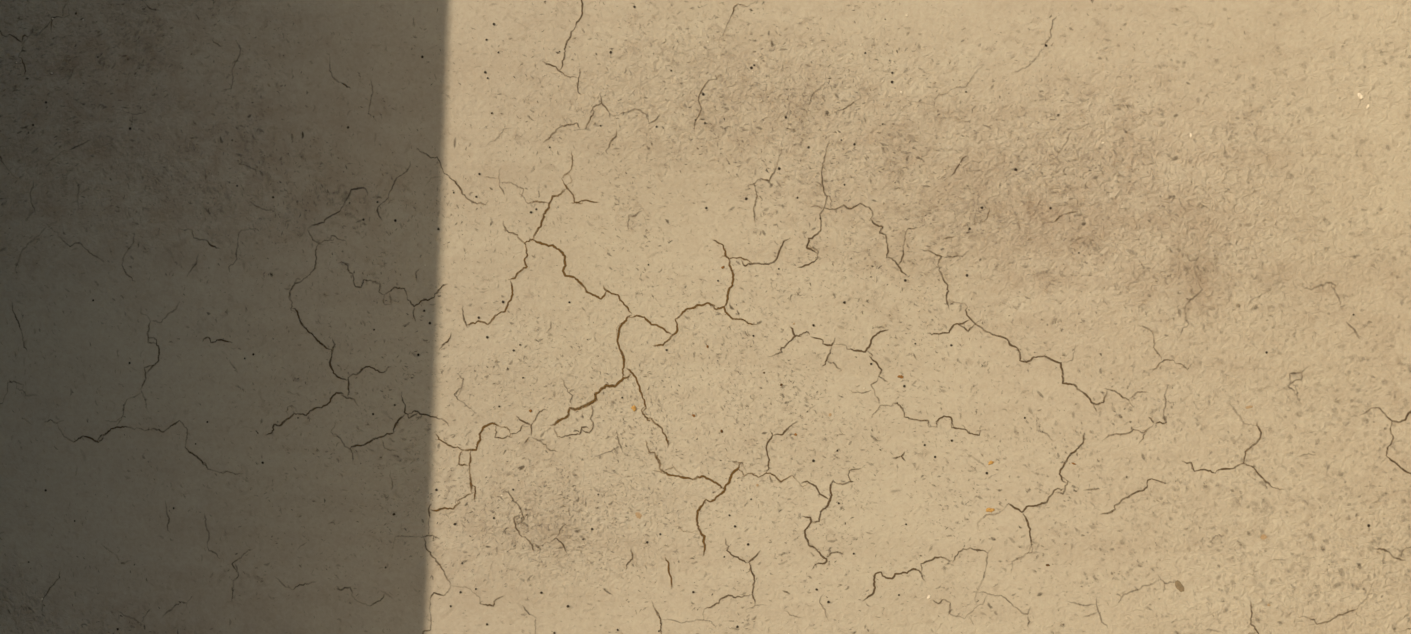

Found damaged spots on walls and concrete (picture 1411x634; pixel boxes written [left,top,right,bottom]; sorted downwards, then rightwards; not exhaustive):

crack [265,0,1270,634]
crack [48,338,209,470]
crack [1380,406,1411,477]